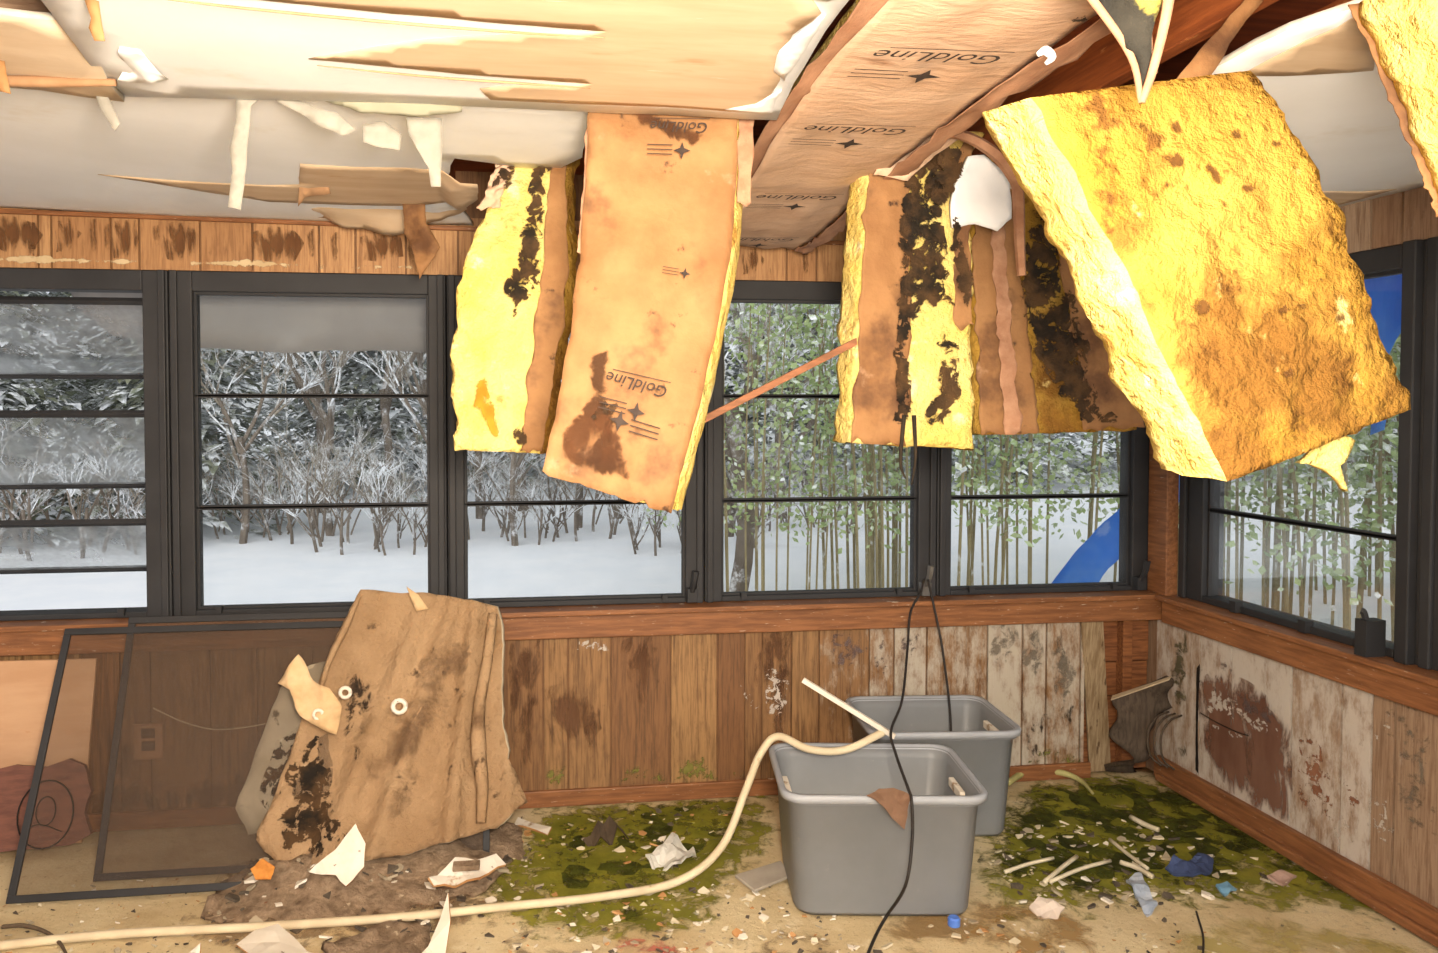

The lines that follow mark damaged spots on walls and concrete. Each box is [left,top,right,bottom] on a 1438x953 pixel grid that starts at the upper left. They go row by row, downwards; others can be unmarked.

water stain [0,217,313,267]
water stain [358,232,412,269]
water stain [509,642,601,756]
water stain [626,638,649,690]
water stain [760,632,789,733]